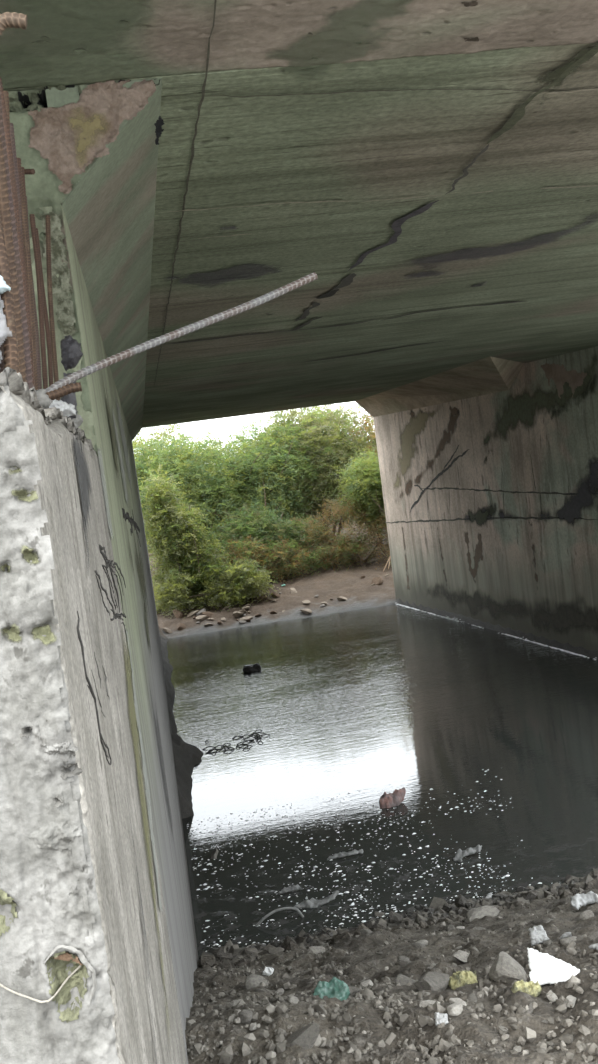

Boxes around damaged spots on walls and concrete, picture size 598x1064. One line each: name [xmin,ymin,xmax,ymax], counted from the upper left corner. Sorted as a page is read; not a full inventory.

spalling [0,12,27,36]
water stain [1,0,146,60]
water stain [271,0,411,76]
crack [161,44,598,345]
spalling [0,77,318,401]
crack [409,445,469,519]
crack [95,545,128,645]
crack [77,611,112,765]
spalling [0,889,18,936]
spalling [43,945,97,1023]